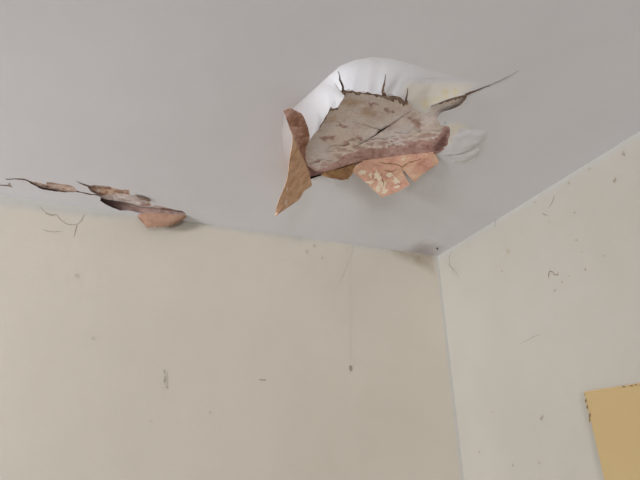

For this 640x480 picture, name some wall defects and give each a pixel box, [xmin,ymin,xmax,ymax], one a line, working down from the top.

flaking render [275,72,488,216]
crack [40,207,84,236]
peeling [6,178,186,228]